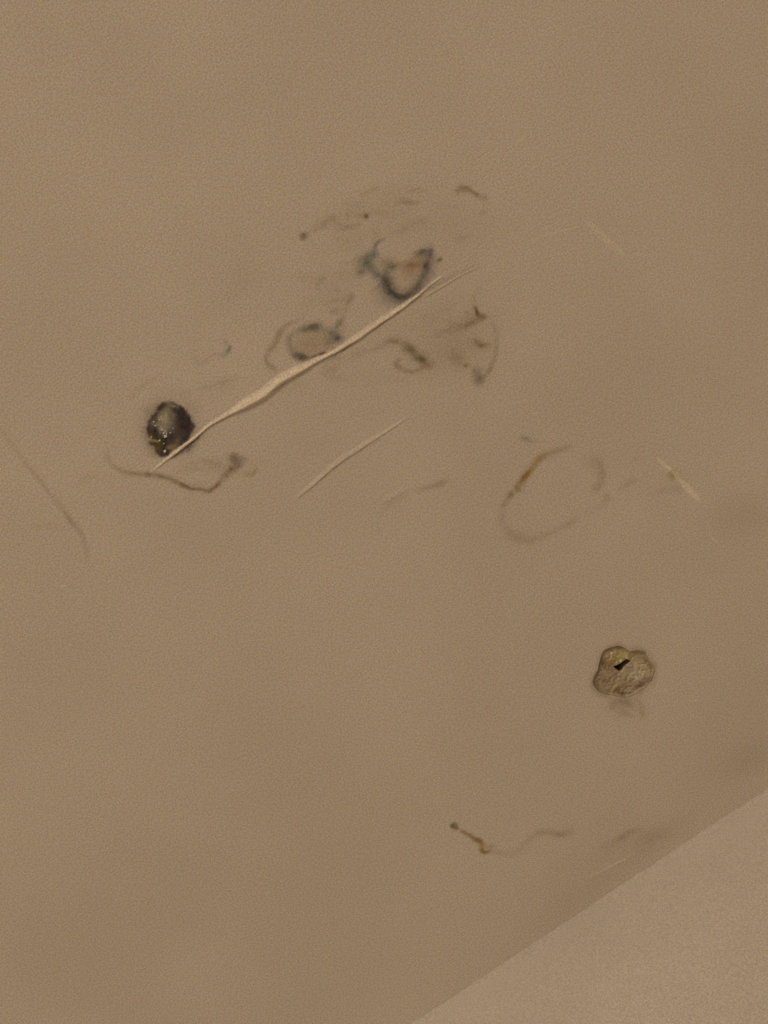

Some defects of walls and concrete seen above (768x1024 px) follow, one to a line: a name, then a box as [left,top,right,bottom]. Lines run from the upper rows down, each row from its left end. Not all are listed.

spalling [593,646,655,698]